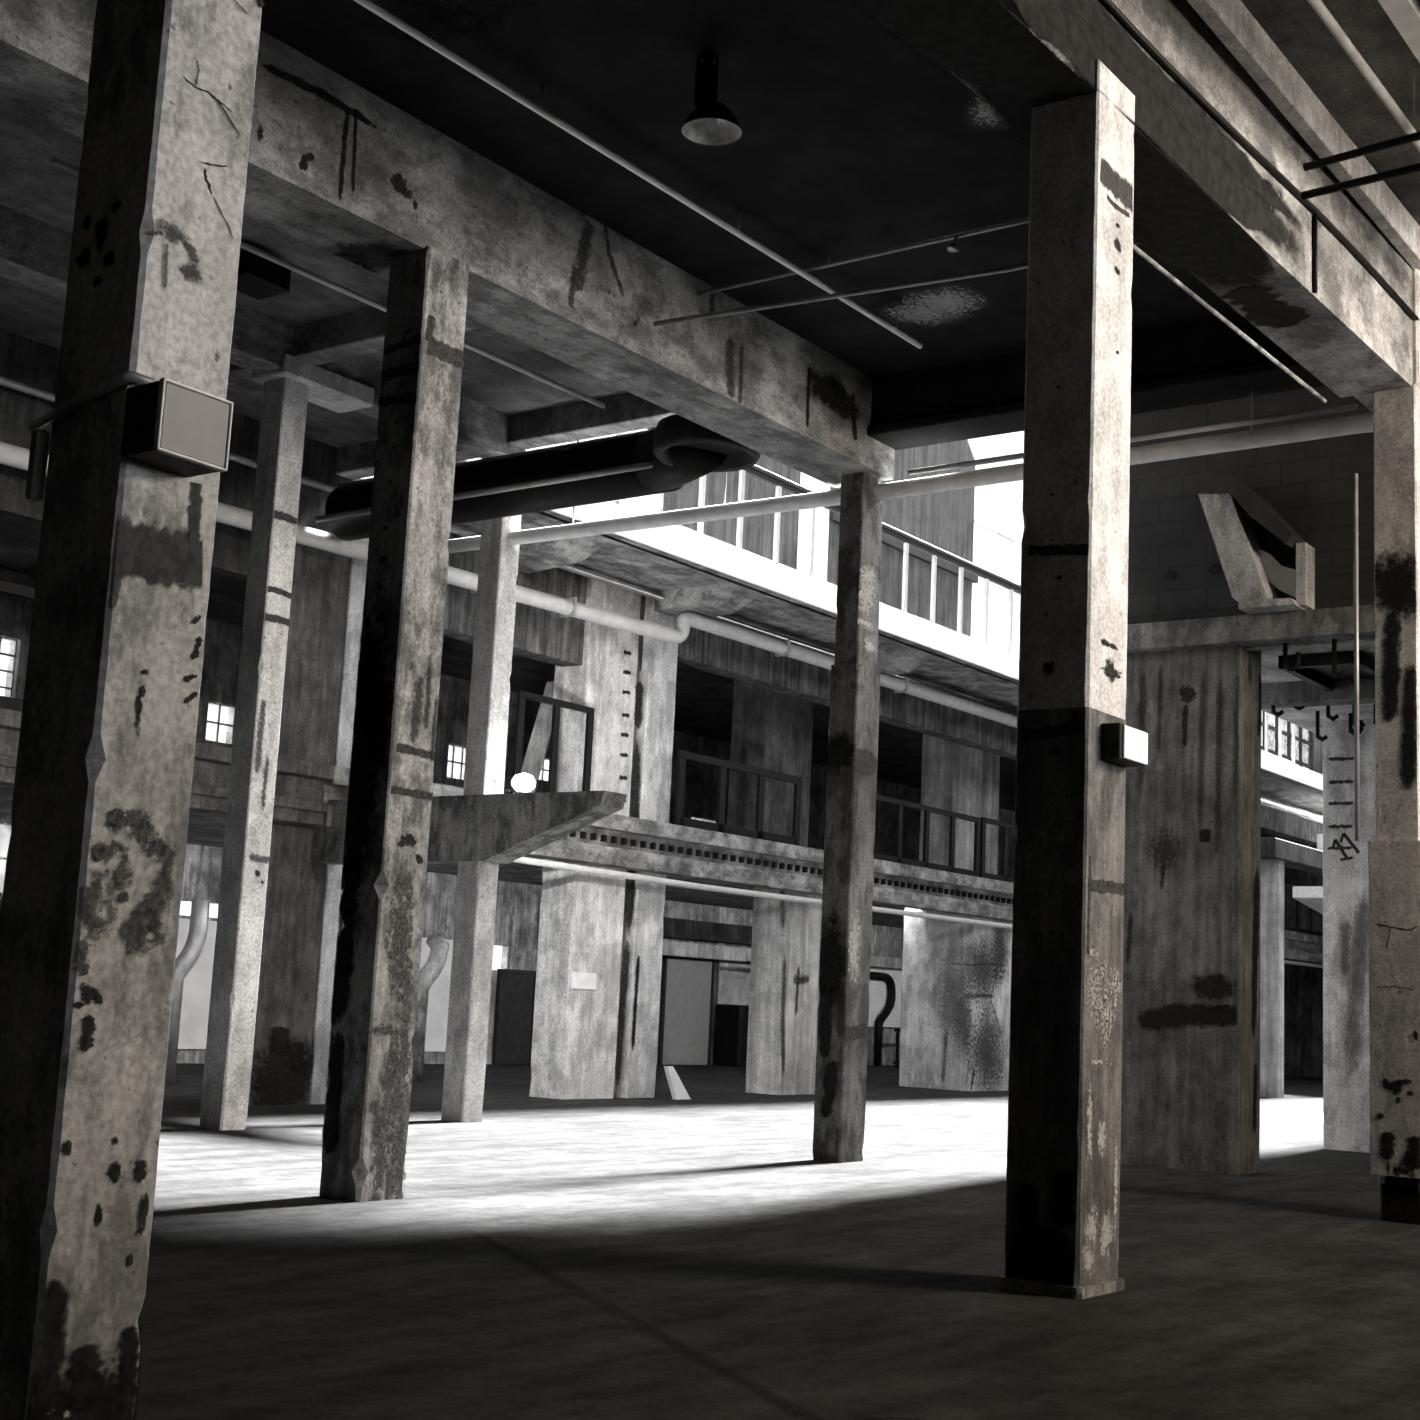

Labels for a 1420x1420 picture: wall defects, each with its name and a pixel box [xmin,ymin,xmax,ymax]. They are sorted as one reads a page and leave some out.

leakage [112,482,203,608]
leakage [1374,551,1417,790]
leakage [1200,829,1211,842]
leakage [1139,974,1238,1030]
leakage [31,1279,141,1420]